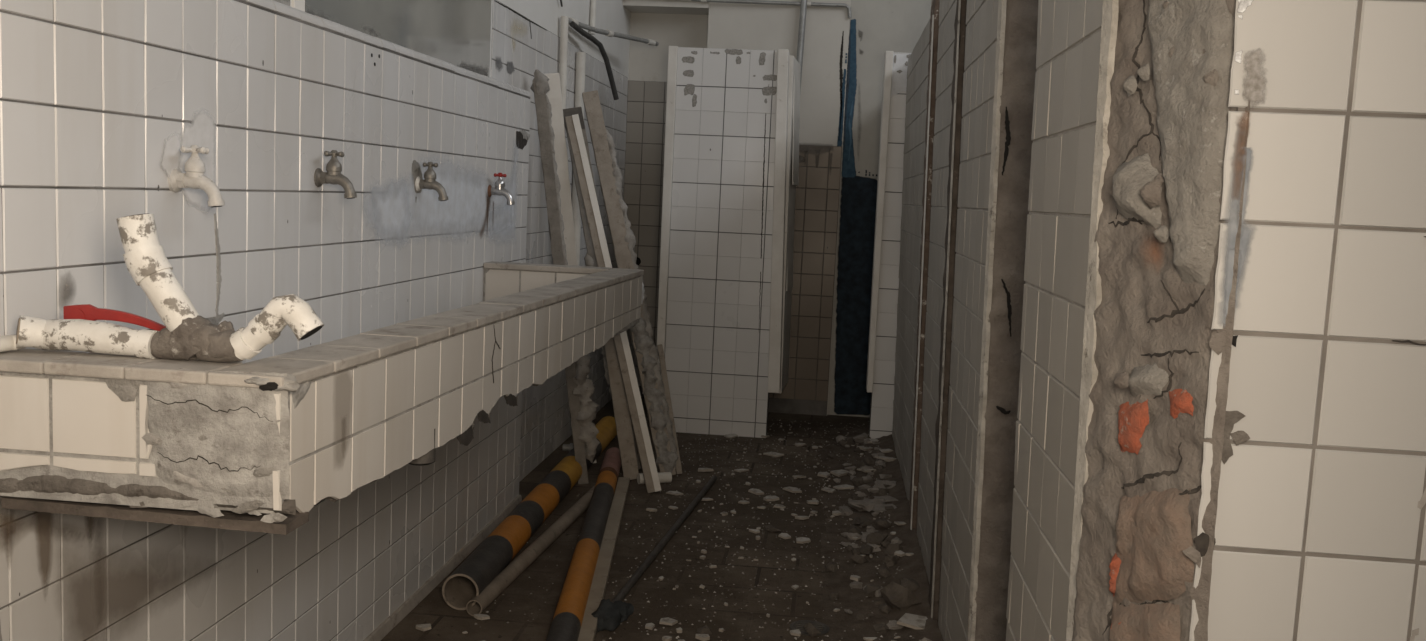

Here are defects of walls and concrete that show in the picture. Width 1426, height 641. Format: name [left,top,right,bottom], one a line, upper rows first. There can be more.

crack [1121,0,1161,165]
crack [1108,209,1144,228]
spalling [1066,0,1266,641]
spalling [0,368,312,523]